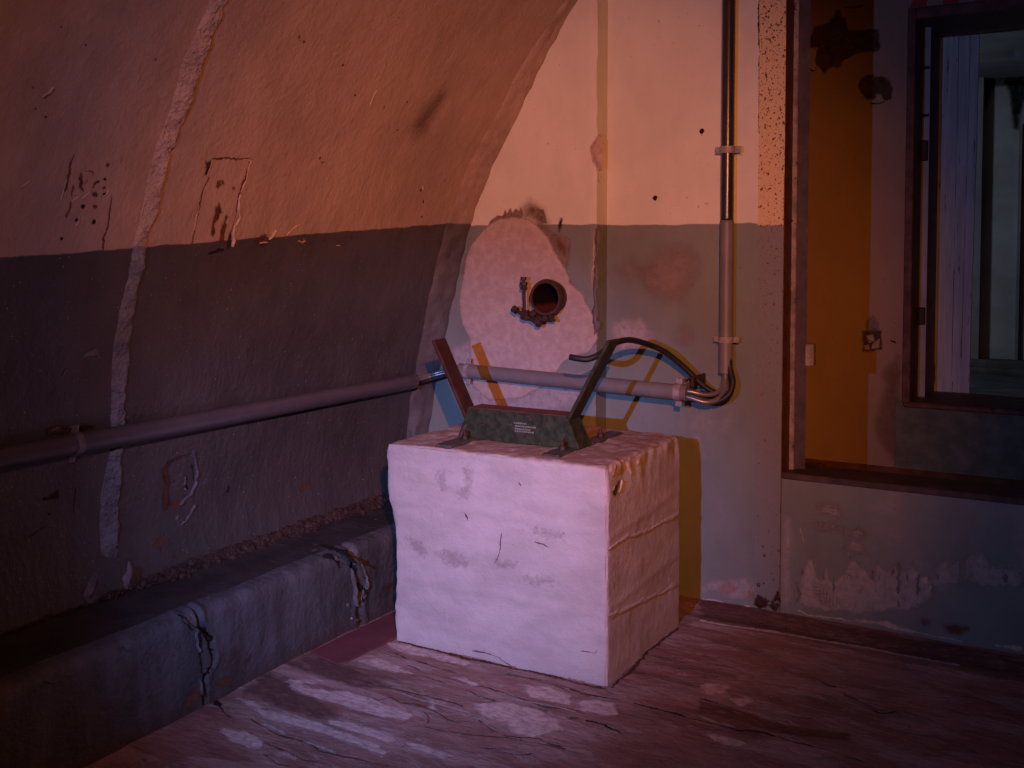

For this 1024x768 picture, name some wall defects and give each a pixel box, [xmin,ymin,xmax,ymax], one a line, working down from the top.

spalling [61,153,110,226]
flaking render [591,226,601,335]
spalling [162,447,199,525]
crack [319,544,370,621]
peeling [701,579,1024,673]
crack [177,614,864,767]